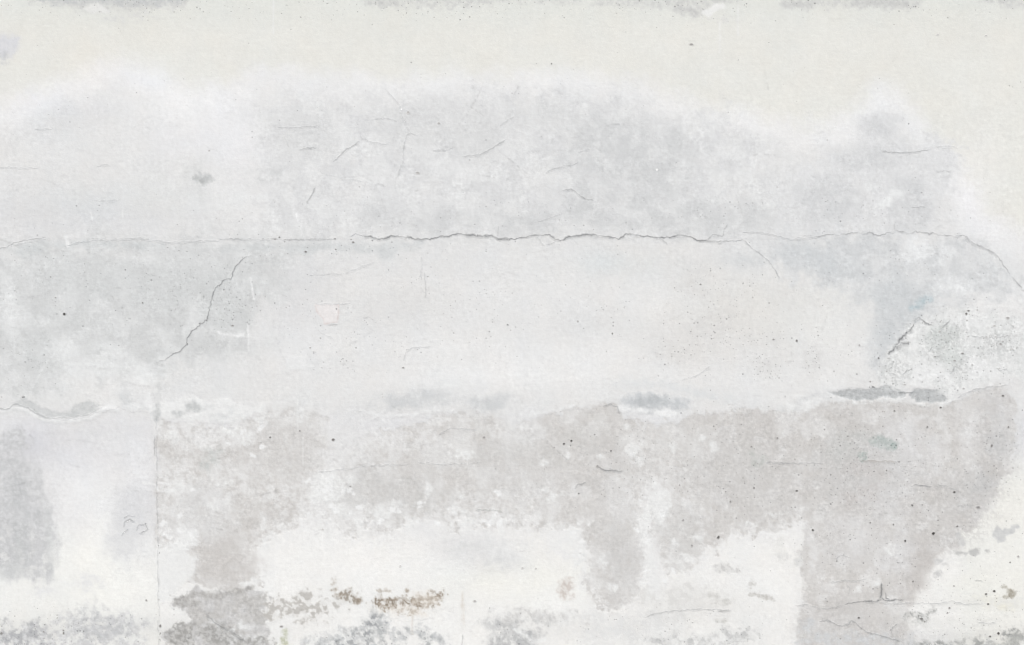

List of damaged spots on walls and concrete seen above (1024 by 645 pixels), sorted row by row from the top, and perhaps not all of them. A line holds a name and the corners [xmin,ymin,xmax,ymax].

water stain [0,73,1024,408]
crack [0,145,1024,363]
water stain [364,380,522,419]
peeling [0,298,1024,645]
water stain [298,611,454,645]
water stain [467,576,1024,645]